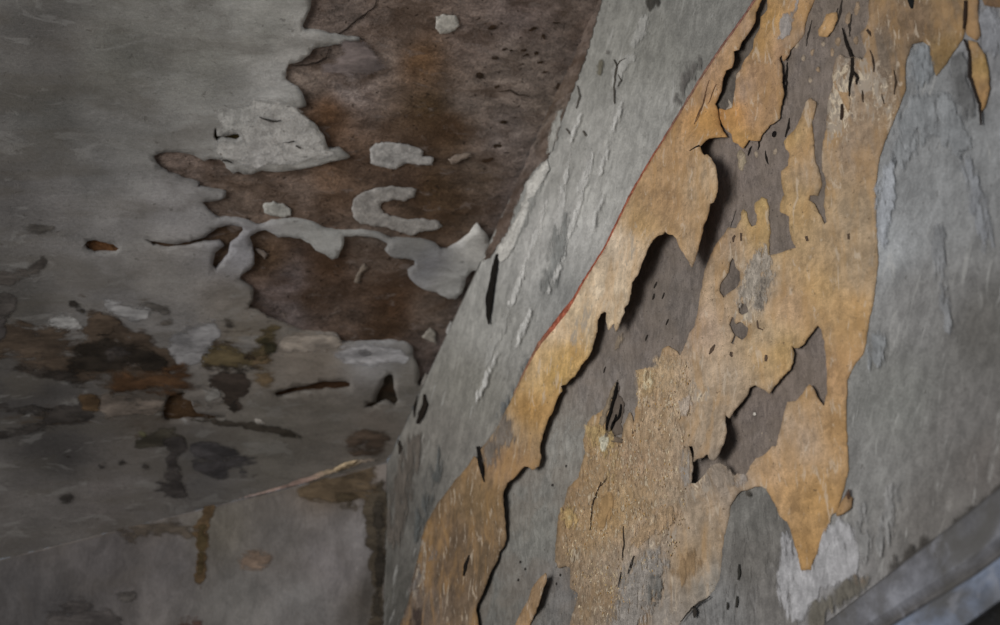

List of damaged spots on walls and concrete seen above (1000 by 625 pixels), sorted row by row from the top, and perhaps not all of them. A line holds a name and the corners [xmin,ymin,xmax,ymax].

flaking render [151,0,599,387]
water stain [0,293,192,439]
water stain [191,325,301,438]
peeling [400,0,1000,625]
water stain [134,427,256,498]